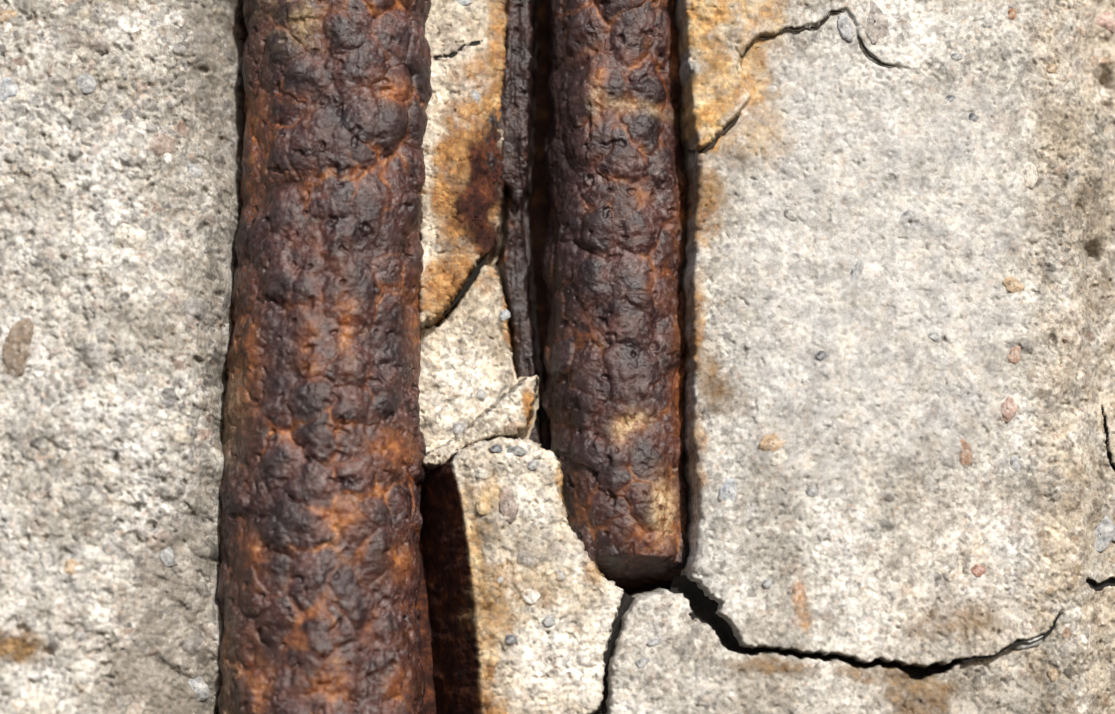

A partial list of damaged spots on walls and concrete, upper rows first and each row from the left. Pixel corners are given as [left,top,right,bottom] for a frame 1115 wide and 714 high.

spalling [122,0,434,714]
corrosion [421,0,508,327]
corrosion [503,303,513,351]
corrosion [522,389,535,425]
spalling [542,0,739,592]
spalling [737,10,841,68]
spalling [746,63,996,476]
corrosion [417,460,508,714]
crack [591,590,636,714]
crack [671,575,1062,680]